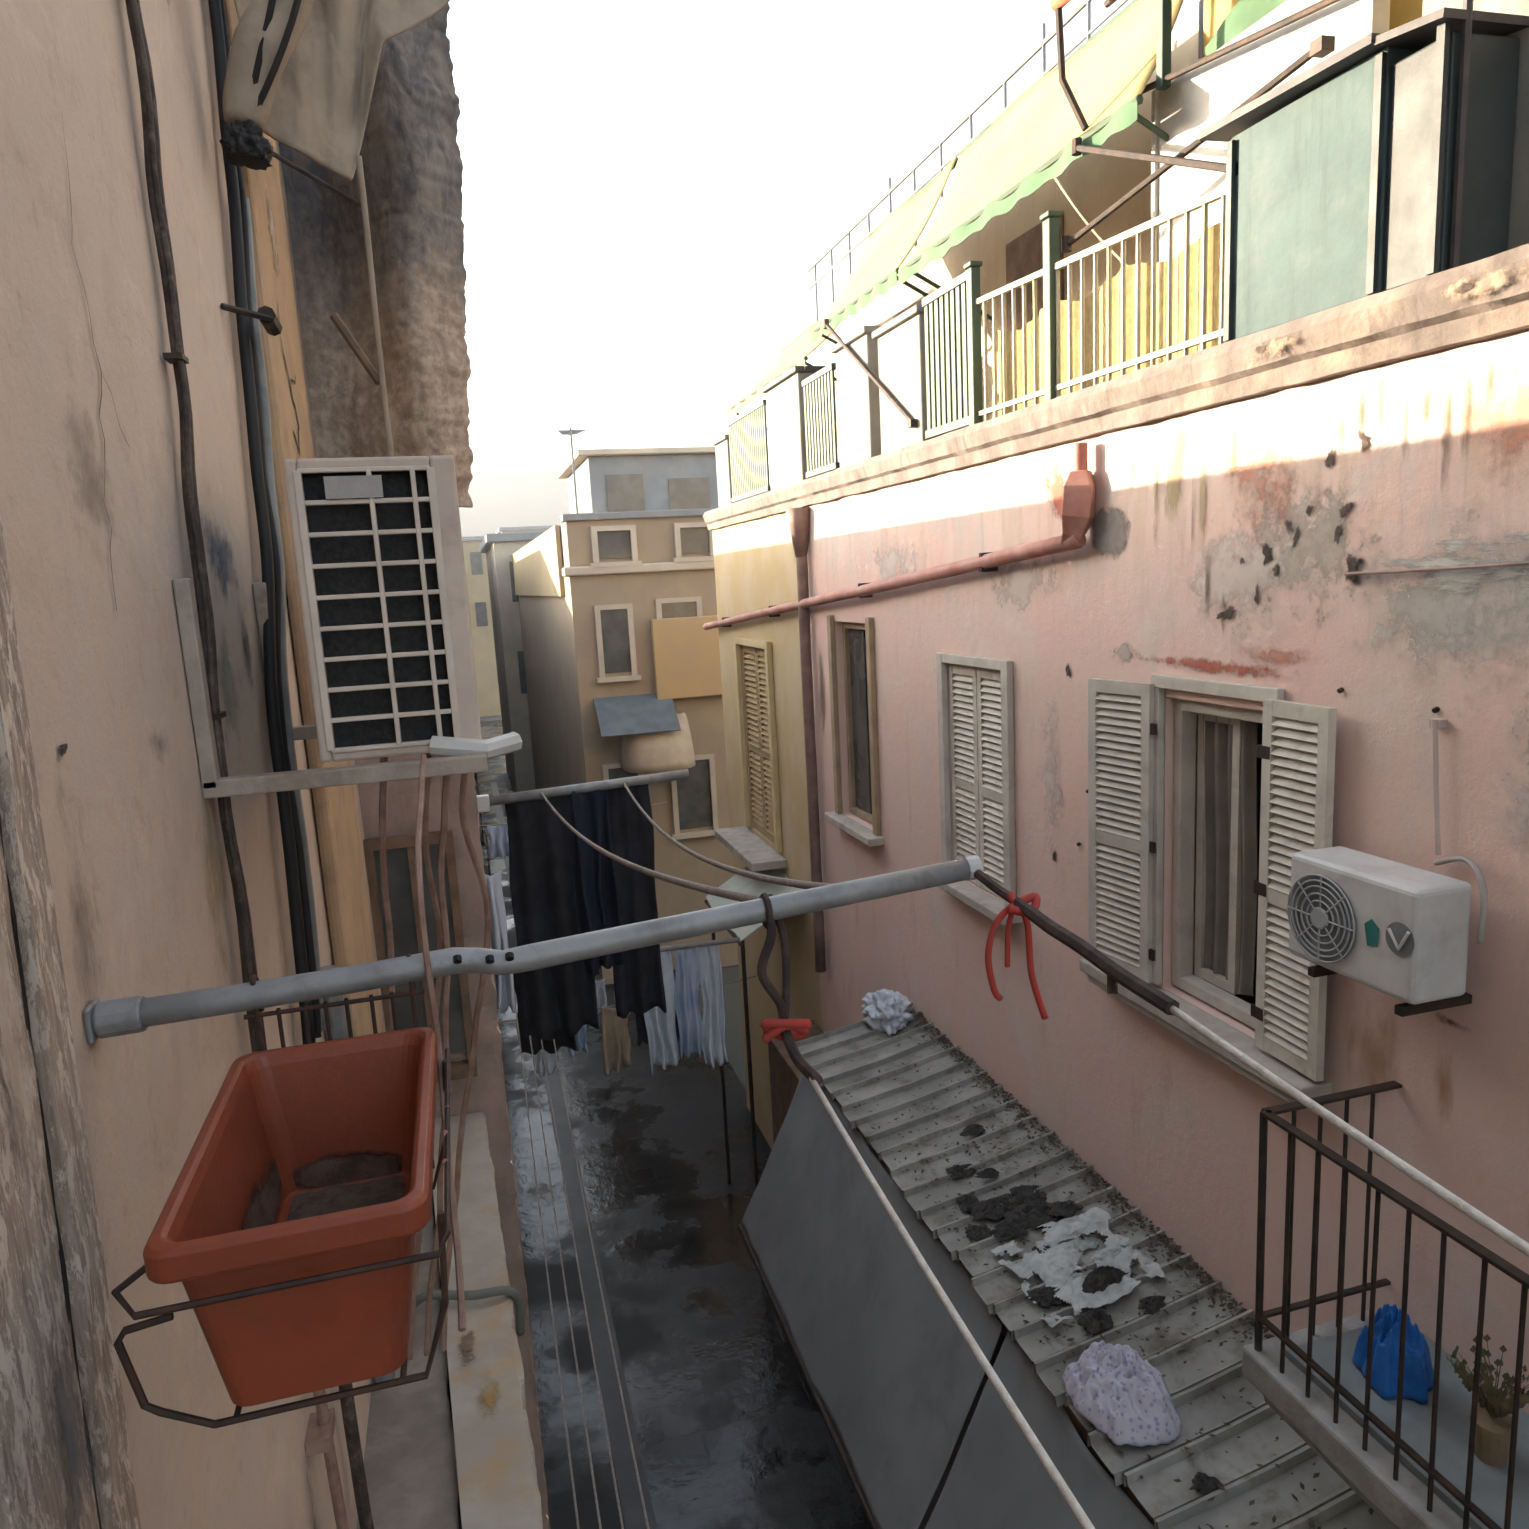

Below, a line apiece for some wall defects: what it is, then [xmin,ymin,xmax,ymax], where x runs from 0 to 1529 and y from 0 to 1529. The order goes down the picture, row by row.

crack [62,120,130,611]
flaking render [1358,431,1369,452]
water stain [1423,366,1491,474]
flaking render [1467,386,1529,453]
flaking render [1195,449,1374,620]